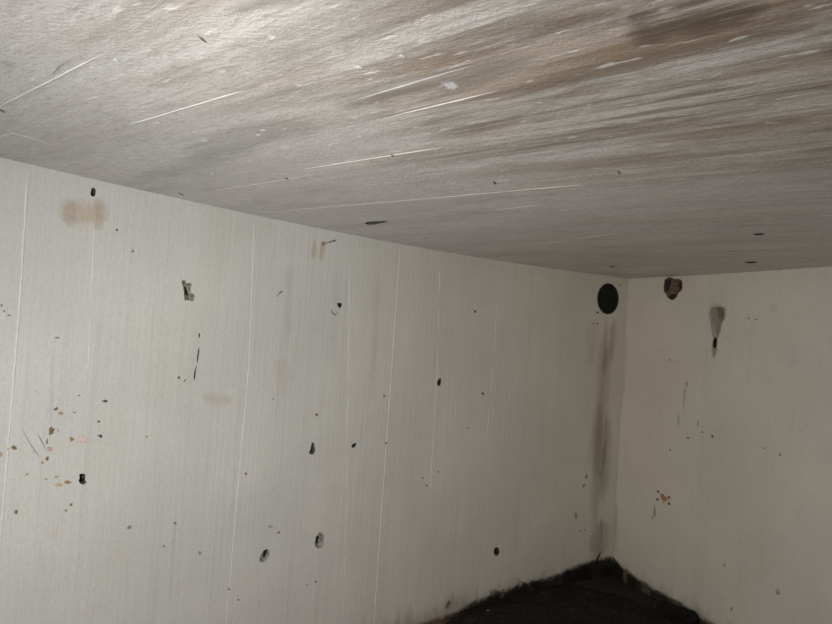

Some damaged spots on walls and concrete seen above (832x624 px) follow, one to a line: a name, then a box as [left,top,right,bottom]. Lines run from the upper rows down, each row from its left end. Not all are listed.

spalling [664,277,683,300]